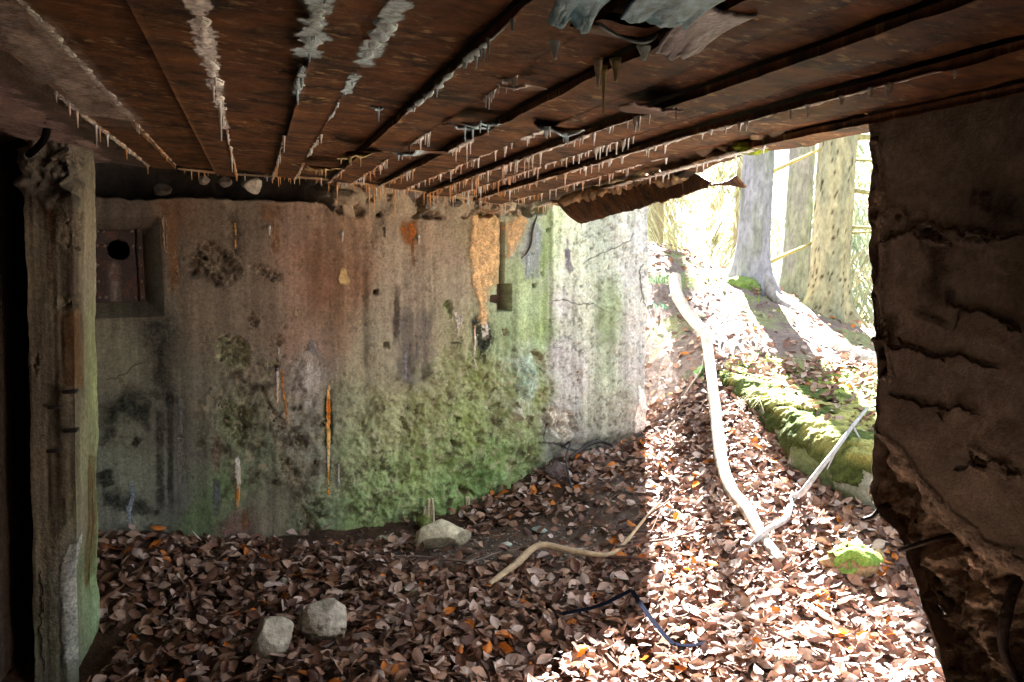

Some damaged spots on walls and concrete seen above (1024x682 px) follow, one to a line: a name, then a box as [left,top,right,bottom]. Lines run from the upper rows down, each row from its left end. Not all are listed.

efflorescence [182,0,230,129]
damp [606,148,765,189]
corrosion [401,222,417,265]
corrosion [469,214,528,337]
crack [886,303,1022,369]
damp [97,322,182,521]
damp [323,395,334,446]
crack [888,394,980,422]
crack [953,450,1021,476]
spalling [868,430,1024,682]